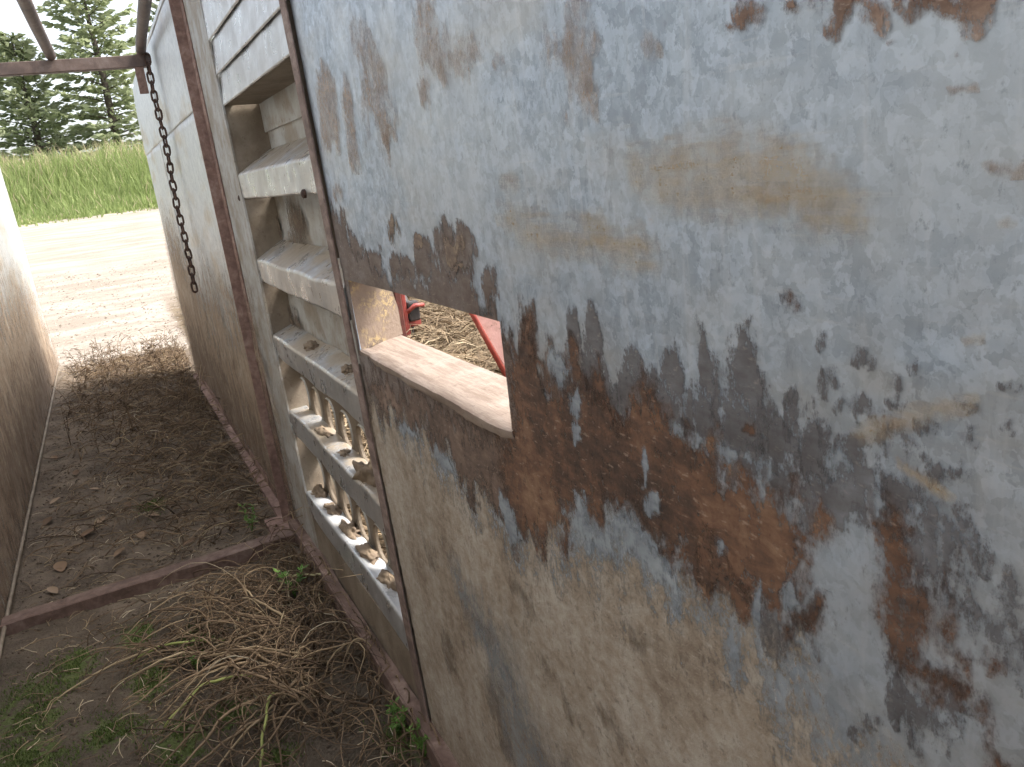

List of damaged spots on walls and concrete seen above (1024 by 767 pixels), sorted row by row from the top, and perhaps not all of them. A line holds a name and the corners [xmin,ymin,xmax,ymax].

corrosion [726,0,764,30]
corrosion [823,0,996,42]
corrosion [850,349,875,370]
corrosion [817,368,872,419]
corrosion [884,364,918,410]
corrosion [361,304,834,641]
corrosion [921,452,969,490]
corrosion [871,495,1011,767]